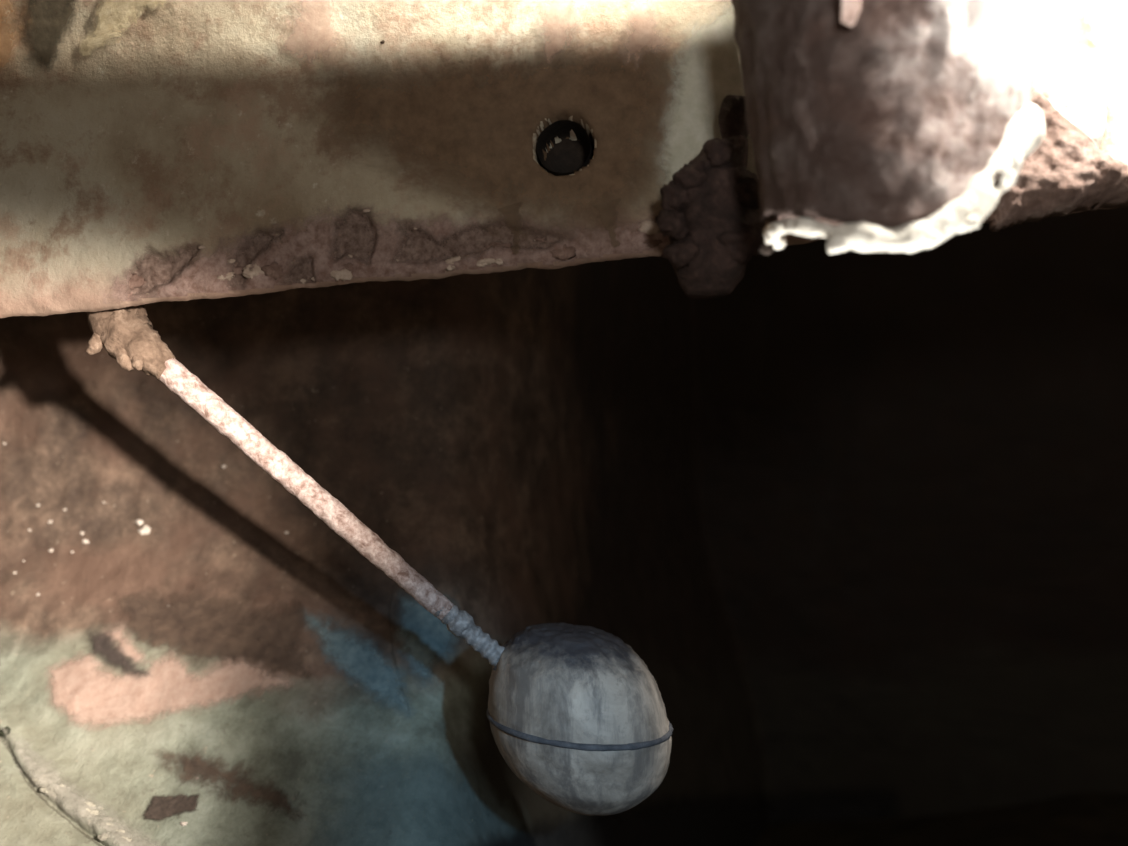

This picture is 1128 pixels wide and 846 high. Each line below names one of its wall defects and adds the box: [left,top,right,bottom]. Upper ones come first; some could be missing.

peeling [841,0,861,26]
crack [16,743,154,846]